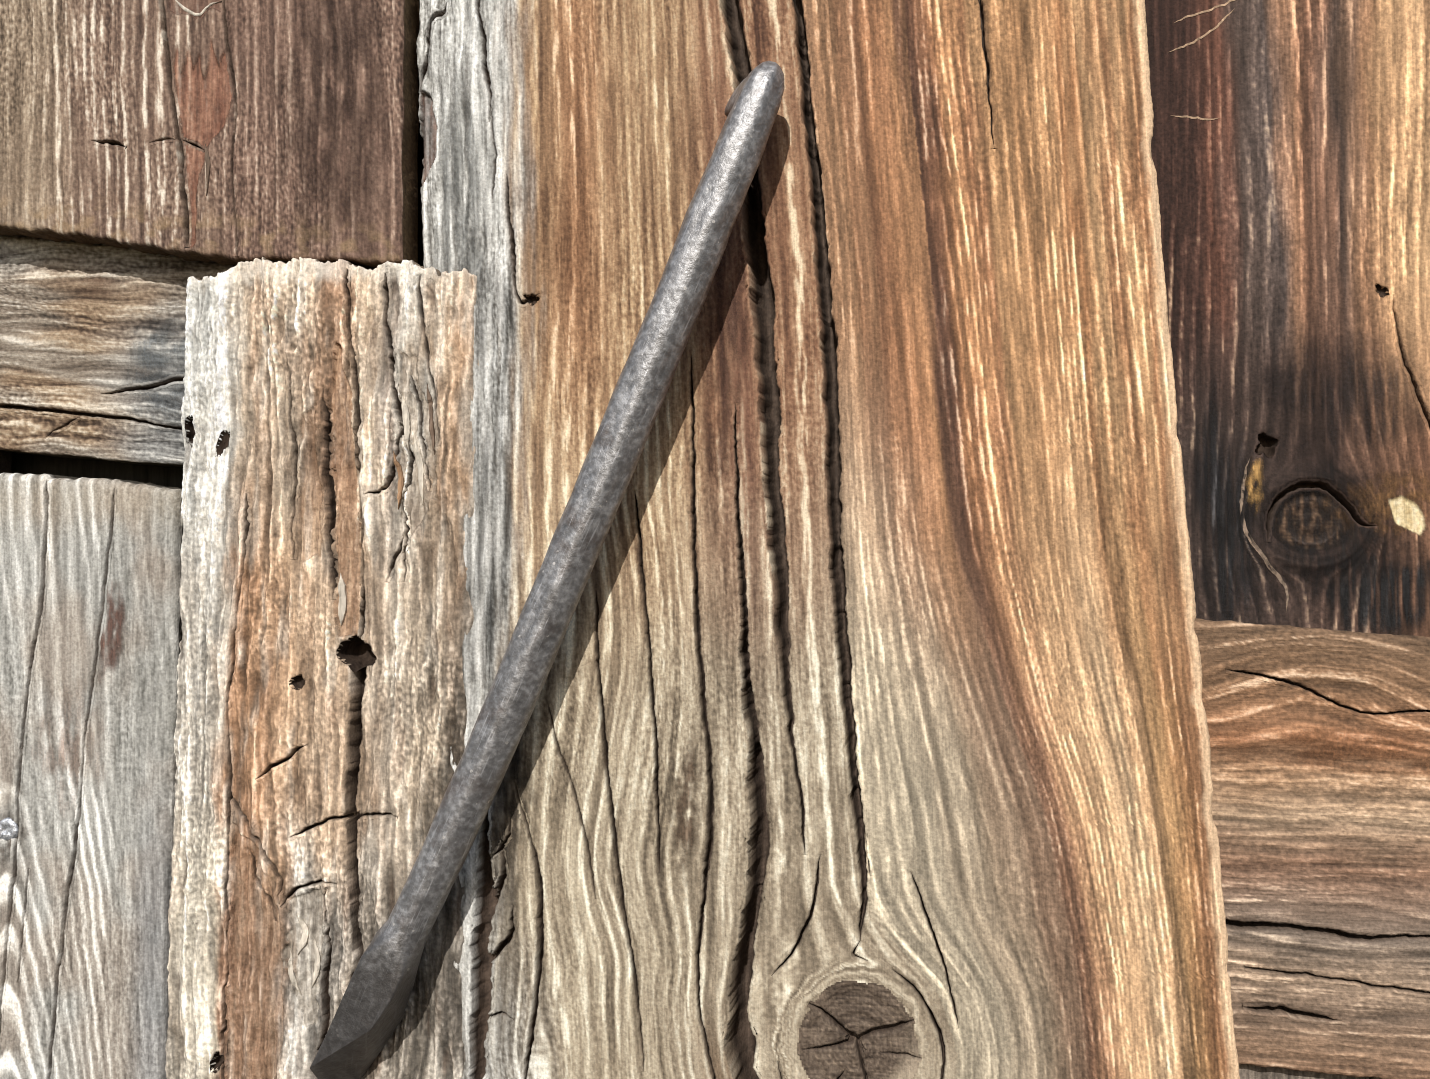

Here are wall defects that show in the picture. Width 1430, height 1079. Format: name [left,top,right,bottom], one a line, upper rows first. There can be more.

crack [91,0,240,256]
crack [419,0,541,308]
crack [0,374,185,440]
crack [217,268,442,1079]
crack [466,779,547,1079]
crack [545,491,663,1072]
crack [686,0,962,1079]
crack [1225,666,1430,719]
crack [1226,916,1430,1025]
crack [1389,294,1430,438]